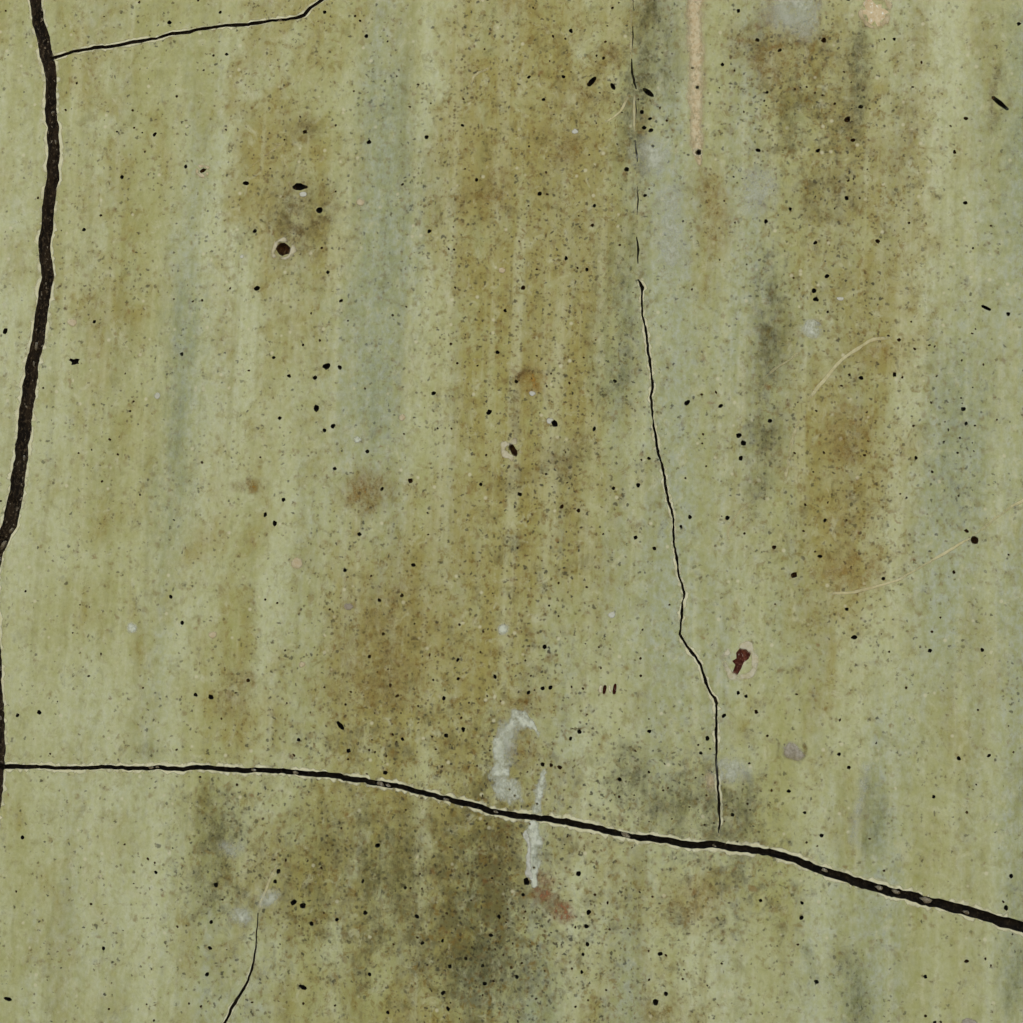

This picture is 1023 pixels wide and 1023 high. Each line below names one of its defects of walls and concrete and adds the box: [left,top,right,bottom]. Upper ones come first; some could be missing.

crack [606,0,638,162]
crack [0,0,325,591]
crack [0,237,1023,937]
damp [489,710,539,804]
damp [523,770,546,888]
crack [222,870,275,1023]